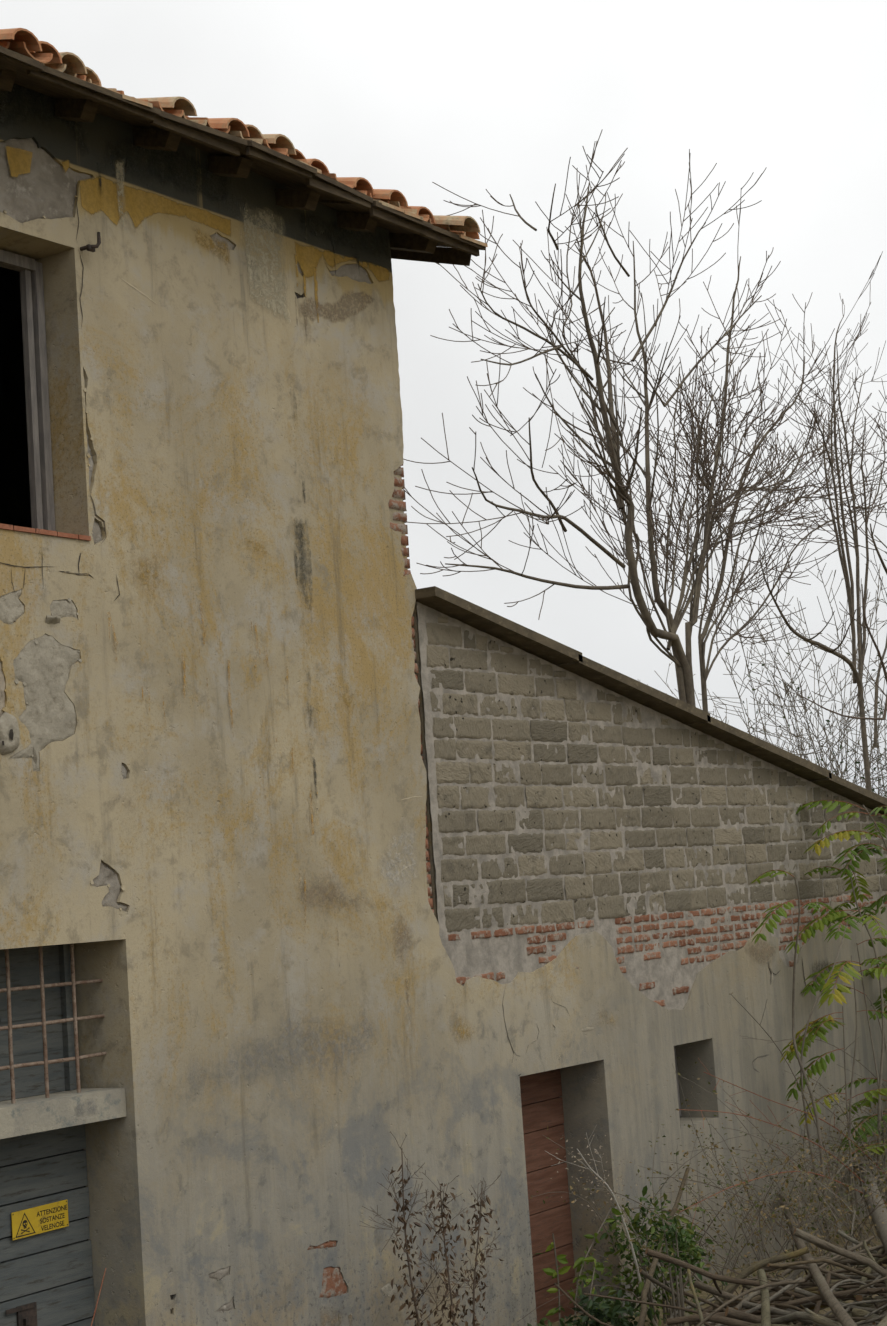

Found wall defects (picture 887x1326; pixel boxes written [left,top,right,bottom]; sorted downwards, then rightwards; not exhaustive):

spalling [0,138,234,250]
crack [76,185,84,329]
peeling [295,242,389,323]
damp [295,523,312,587]
spalling [0,598,82,771]
spalling [90,862,127,911]
crack [502,986,566,1076]
spalling [307,1240,337,1250]
spalling [319,1266,347,1298]